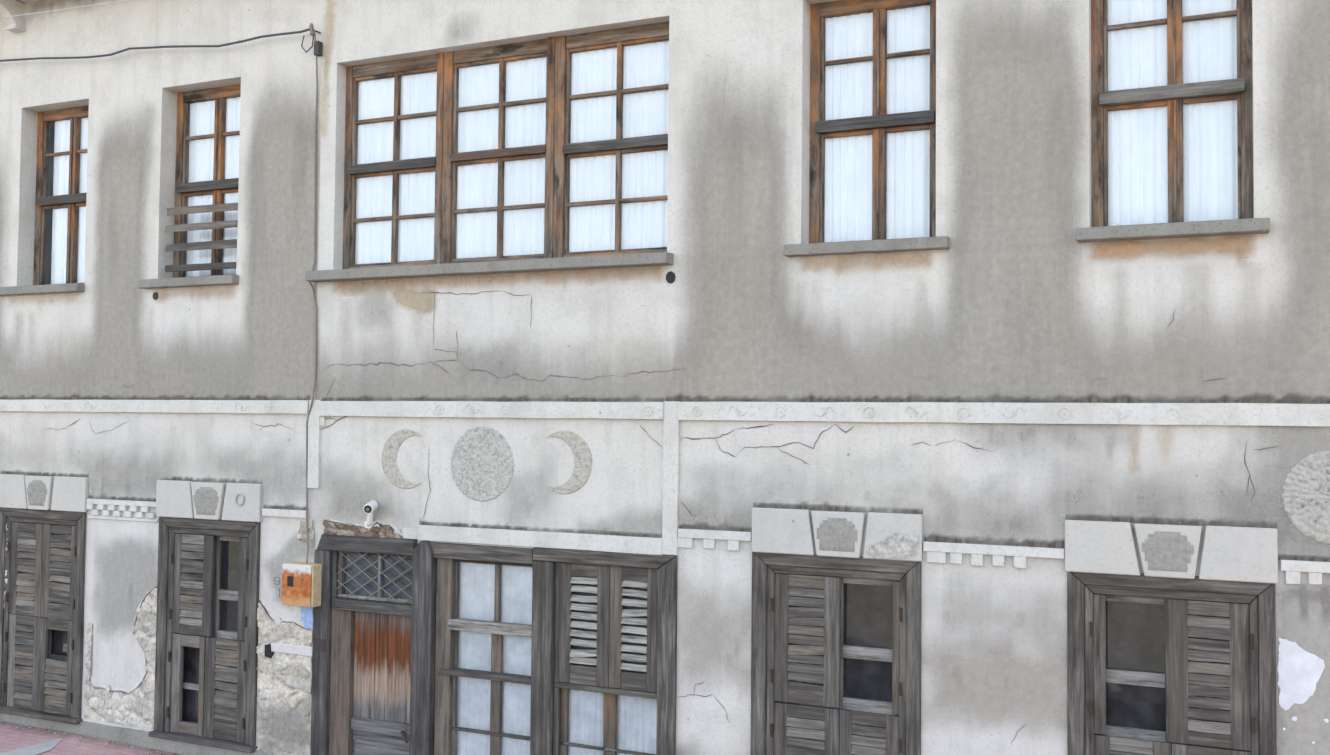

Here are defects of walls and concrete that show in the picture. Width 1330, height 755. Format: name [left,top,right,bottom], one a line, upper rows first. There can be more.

water stain [0,0,1330,404]
crack [249,291,686,430]
crack [640,424,853,465]
water stain [679,503,859,532]
water stain [924,511,1065,549]
water stain [1065,426,1330,562]
crack [1244,438,1281,502]
spalling [84,587,157,729]
spalling [256,598,313,755]
peeling [1277,637,1325,731]